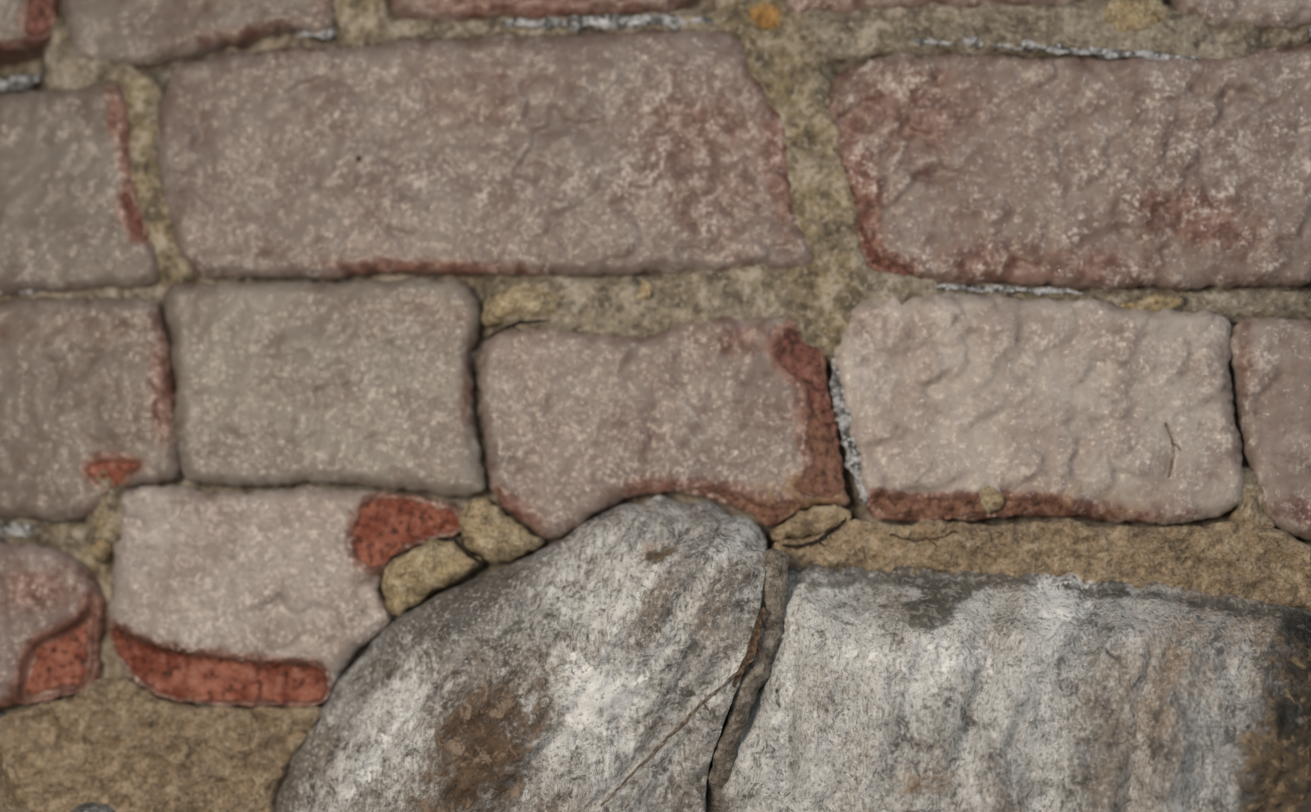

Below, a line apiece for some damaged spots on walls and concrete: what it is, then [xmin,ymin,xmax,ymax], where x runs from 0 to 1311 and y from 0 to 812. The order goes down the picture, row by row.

crack [600,607,780,806]